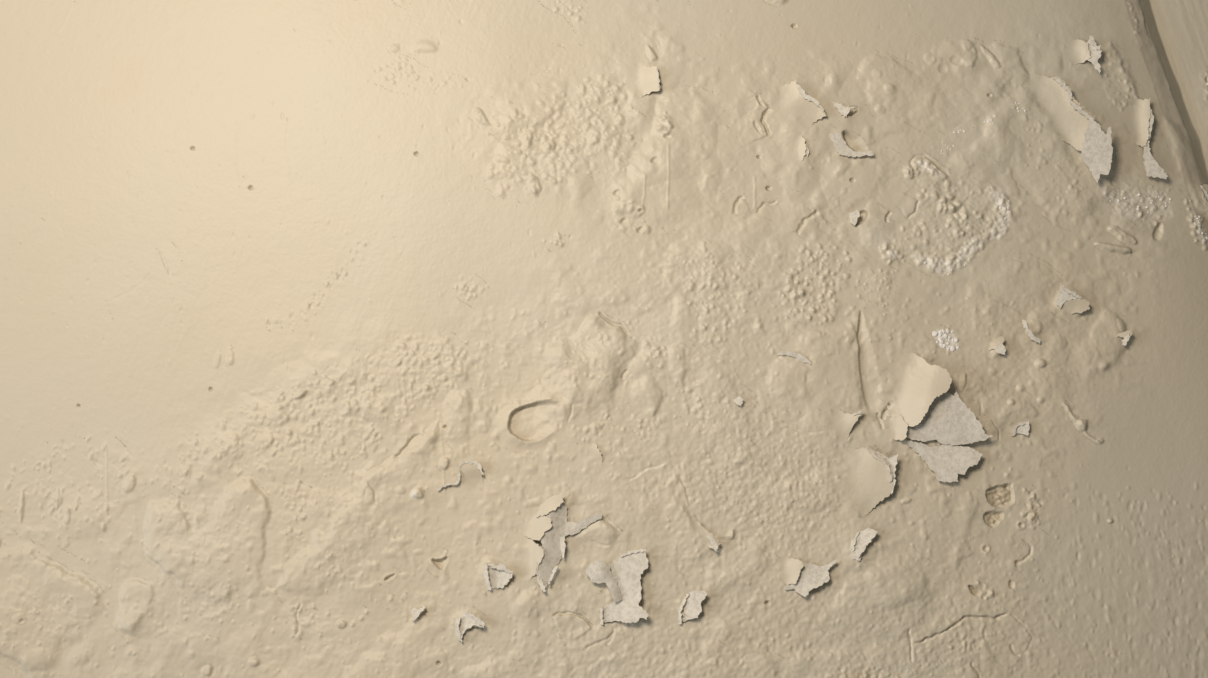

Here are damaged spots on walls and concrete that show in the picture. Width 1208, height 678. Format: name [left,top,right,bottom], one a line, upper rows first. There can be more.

peeling [765,80,855,165]
peeling [829,132,874,157]
peeling [1023,66,1208,249]
peeling [776,353,993,597]
peeling [482,493,602,592]
peeling [455,611,485,642]
peeling [586,549,649,625]
peeling [678,591,708,624]